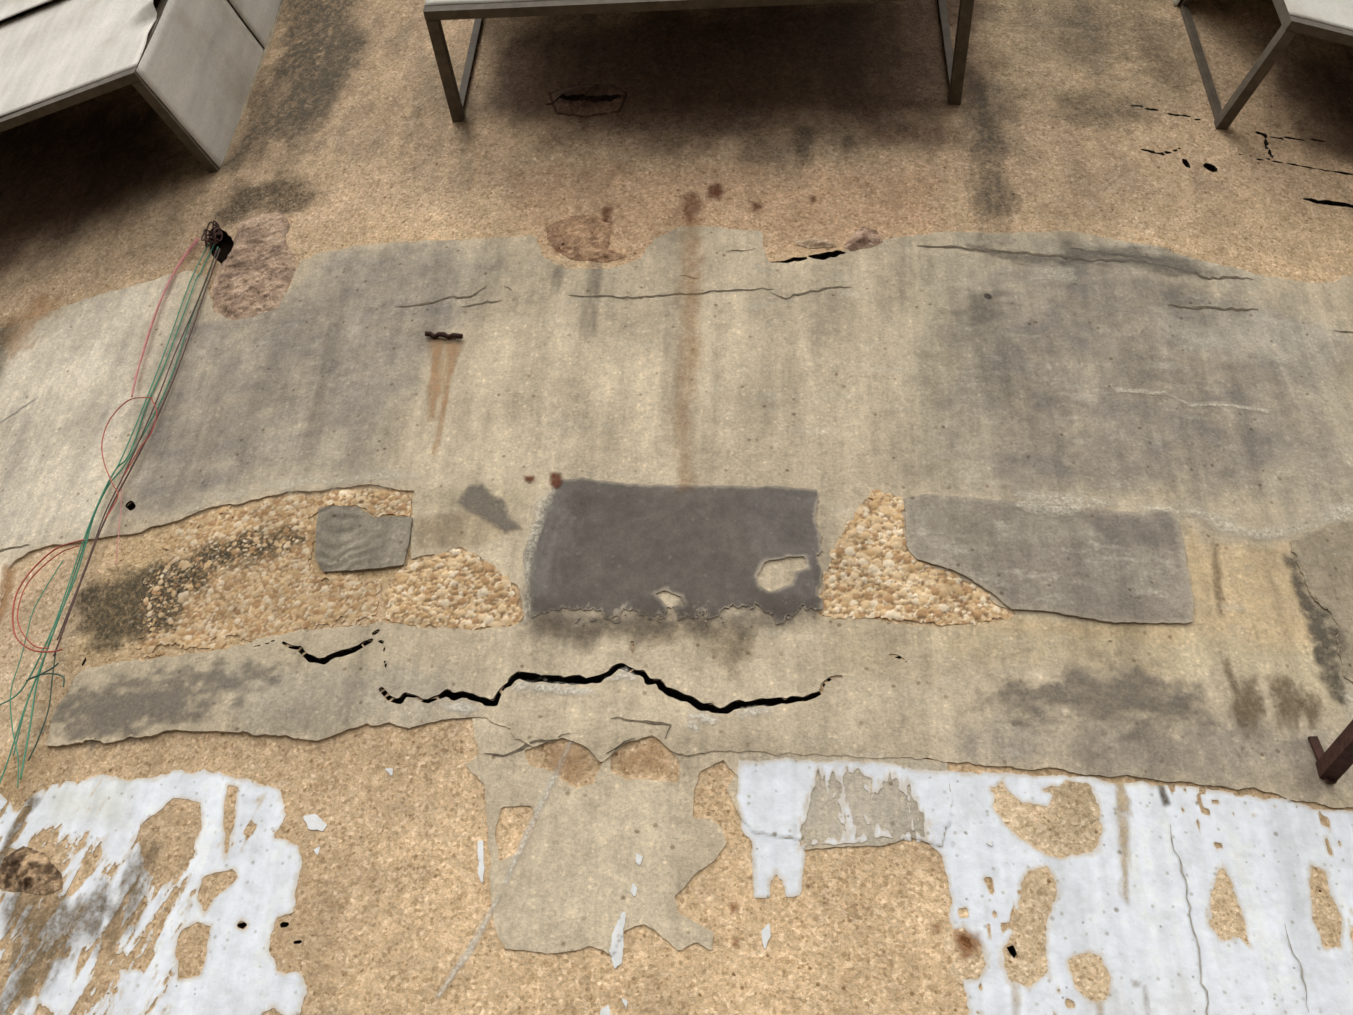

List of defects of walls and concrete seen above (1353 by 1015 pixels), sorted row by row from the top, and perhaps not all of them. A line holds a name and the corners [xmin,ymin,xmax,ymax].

spalling [210,210,296,321]
spalling [546,214,627,263]
crack [573,275,848,299]
spalling [130,488,524,658]
spalling [818,489,1013,626]
crack [379,641,609,706]
peeling [0,769,307,1015]
peeling [736,757,1353,1015]